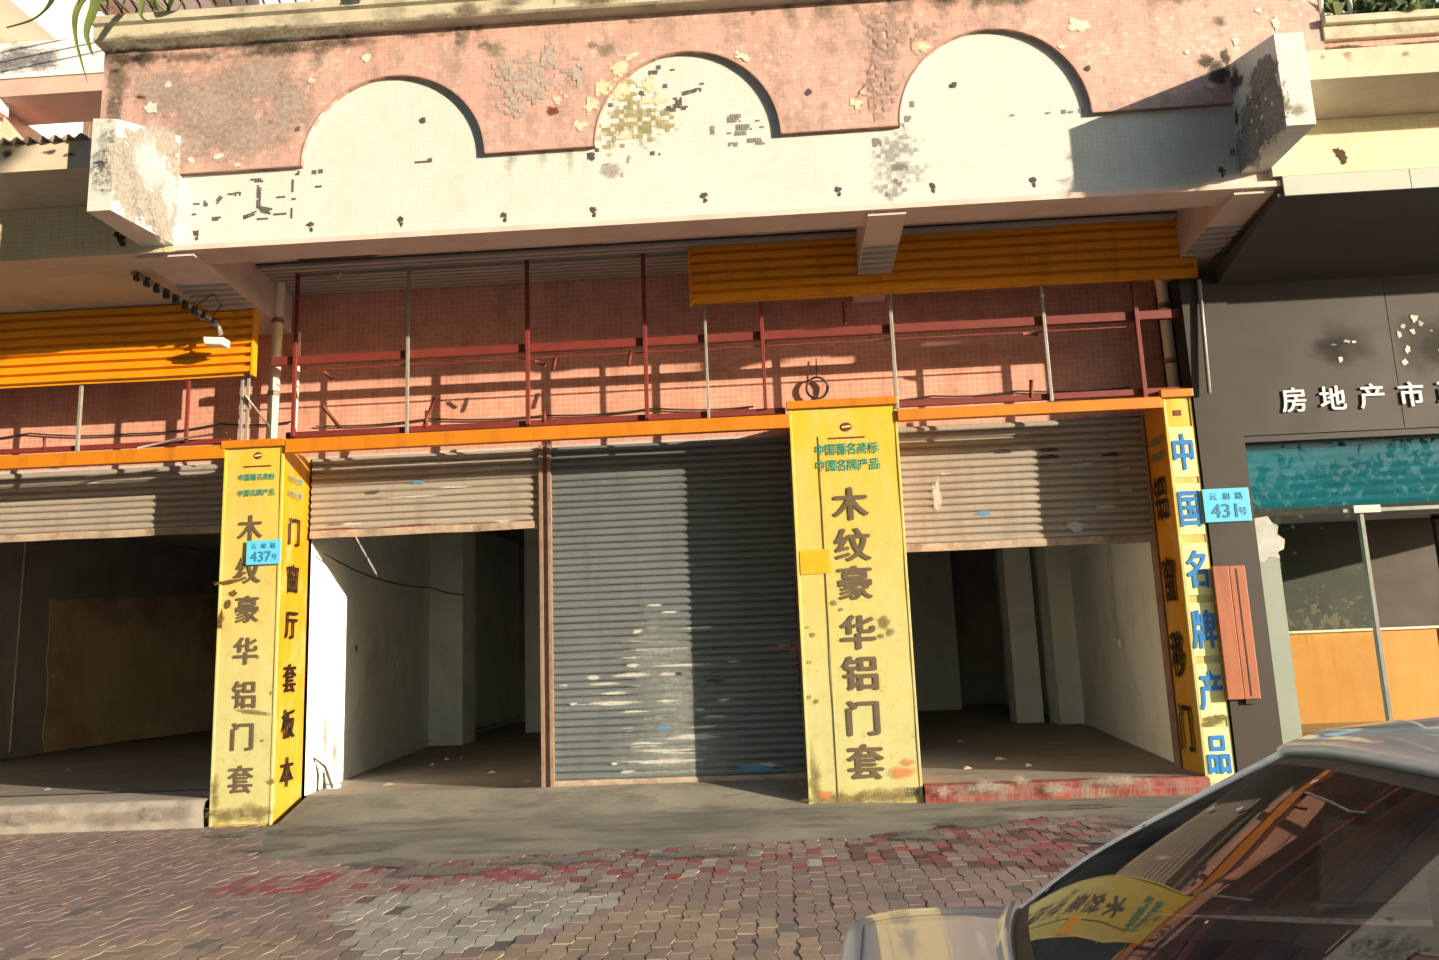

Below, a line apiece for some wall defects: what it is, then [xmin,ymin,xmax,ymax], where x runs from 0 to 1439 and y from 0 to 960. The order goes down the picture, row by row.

peeling [486,43,704,132]
peeling [100,101,323,245]
peeling [587,130,636,178]